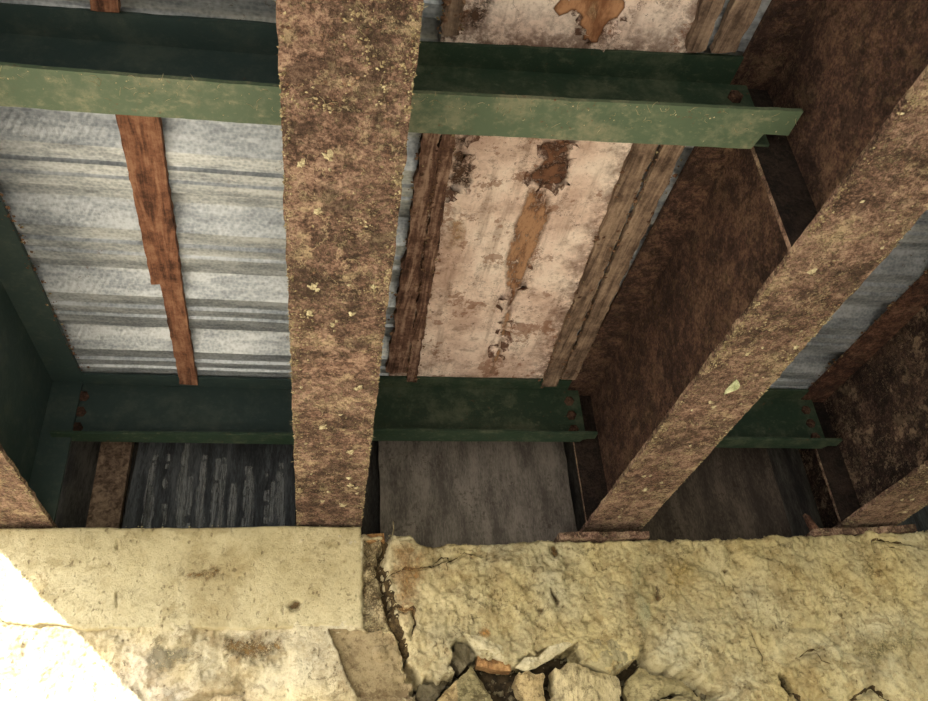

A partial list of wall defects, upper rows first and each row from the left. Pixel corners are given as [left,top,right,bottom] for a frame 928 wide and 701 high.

peeling [553,0,627,52]
peeling [488,140,579,375]
flaking render [328,540,416,701]
crack [375,542,482,667]
flaking render [464,633,504,662]
spalling [435,639,644,701]
crack [850,685,889,701]